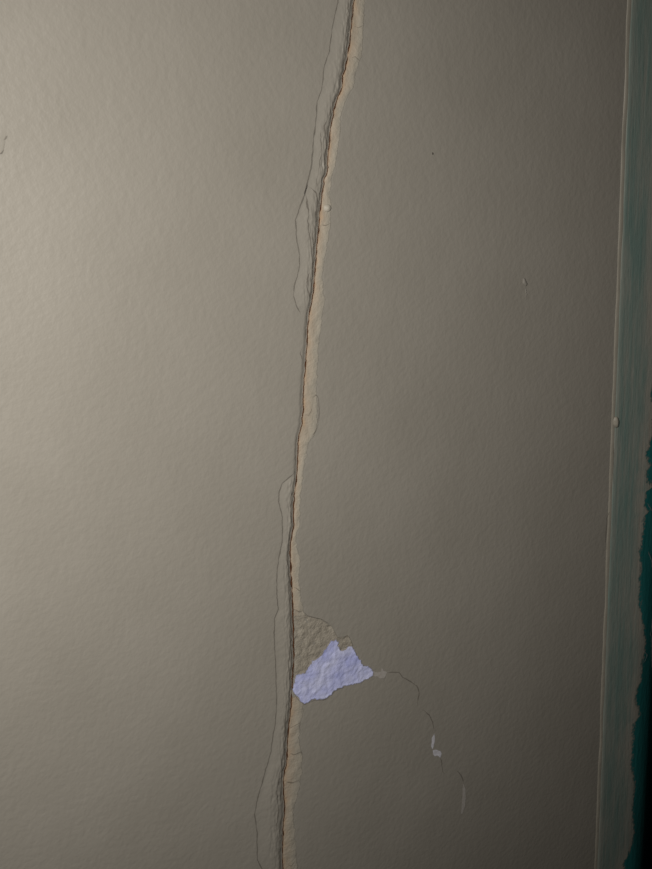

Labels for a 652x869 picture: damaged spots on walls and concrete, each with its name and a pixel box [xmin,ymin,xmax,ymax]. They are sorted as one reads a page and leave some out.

crack [282,0,365,869]
peeling [292,609,387,704]